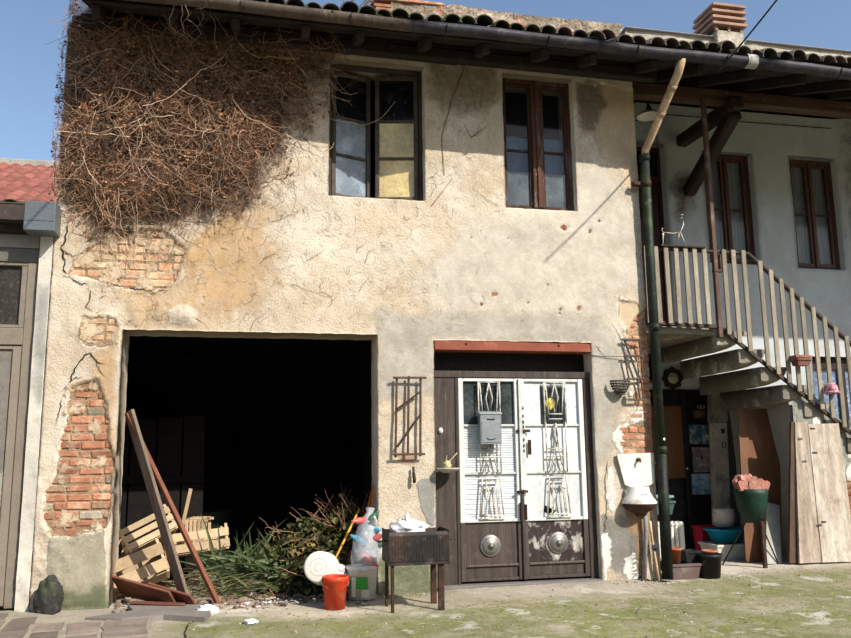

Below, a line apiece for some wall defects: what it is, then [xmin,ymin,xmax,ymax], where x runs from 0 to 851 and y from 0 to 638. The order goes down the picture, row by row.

water stain [578,82,606,129]
crack [61,223,165,310]
spalling [65,225,188,293]
spalling [78,316,120,347]
crack [56,353,104,420]
spalling [605,301,653,512]
peeling [793,392,841,424]
spalling [44,374,114,538]
peeling [840,427,851,515]
peeling [601,533,612,580]
peeling [623,553,639,580]